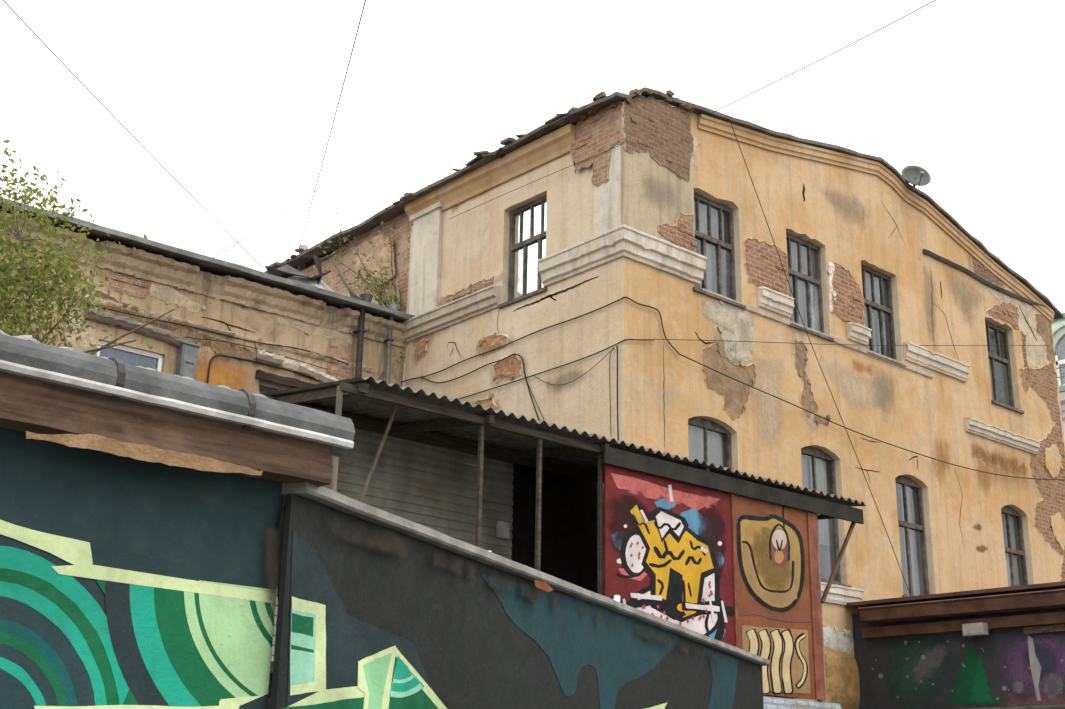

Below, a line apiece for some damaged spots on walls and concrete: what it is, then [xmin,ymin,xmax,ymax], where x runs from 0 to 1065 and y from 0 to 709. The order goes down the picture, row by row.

flaking render [567,89,702,187]
flaking render [658,212,697,252]
flaking render [743,237,789,295]
flaking render [827,262,865,326]
flaking render [475,332,523,410]
flaking render [700,300,756,420]
flaking render [793,330,831,428]
flaking render [969,254,1065,582]
peeling [823,624,854,654]